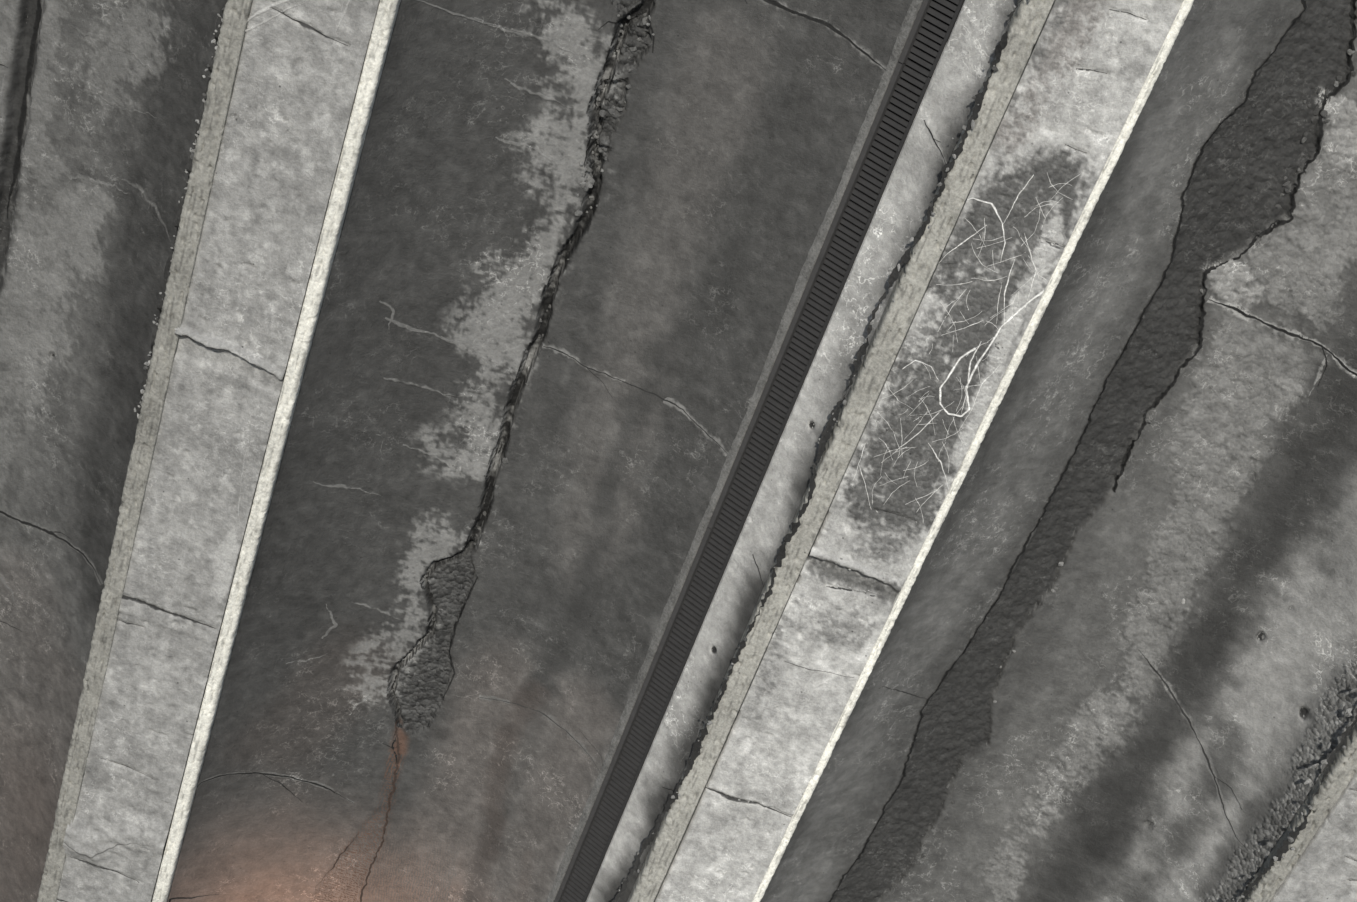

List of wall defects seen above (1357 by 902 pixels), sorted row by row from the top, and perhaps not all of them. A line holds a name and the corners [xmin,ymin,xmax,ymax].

crack [0,0,47,269]
rust [168,700,496,902]
spalling [389,543,480,738]
water stain [286,0,643,902]
crack [382,0,730,771]
water stain [446,211,773,902]
spalling [584,0,654,188]
crack [612,0,1030,902]
spalling [827,0,1357,902]
water stain [965,0,1357,902]
crack [1137,642,1357,902]
crack [1206,296,1357,386]